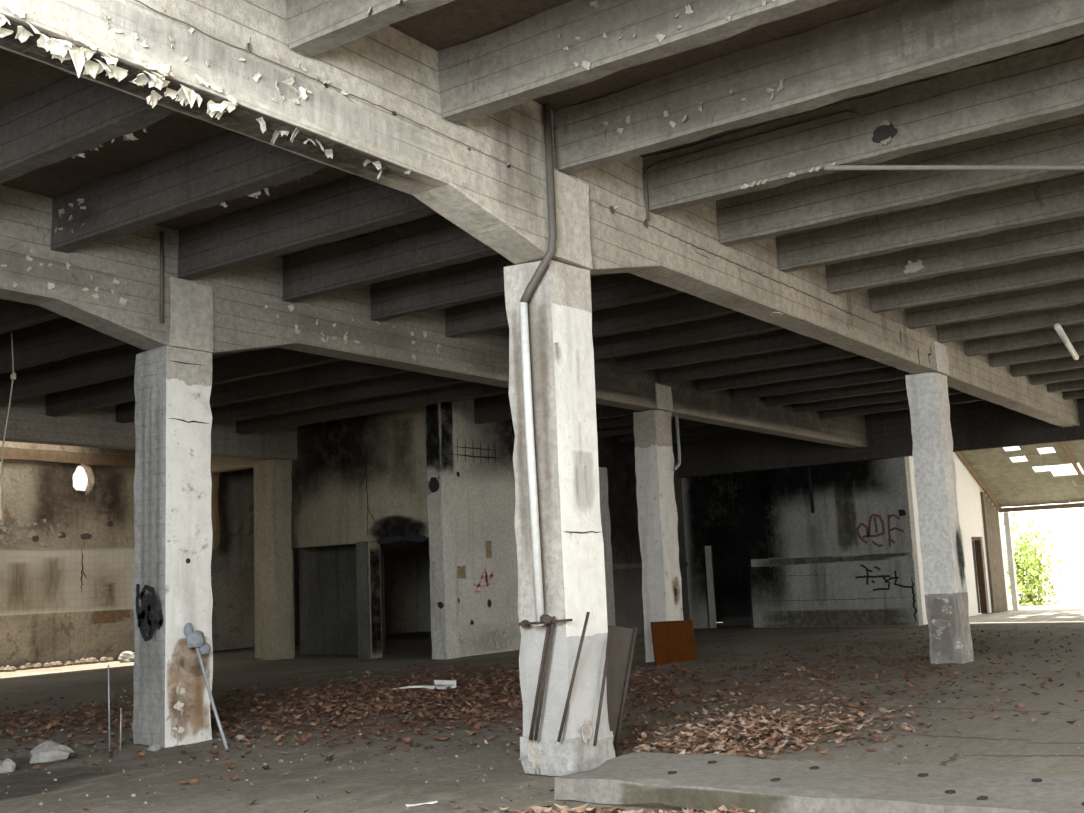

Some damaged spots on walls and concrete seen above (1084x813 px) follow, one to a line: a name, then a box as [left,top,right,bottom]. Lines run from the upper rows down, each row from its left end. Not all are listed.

peeling [0,4,238,120]
peeling [70,126,148,158]
spalling [872,120,898,146]
water stain [743,461,906,566]
water stain [768,610,905,627]
corrosion [168,639,209,738]